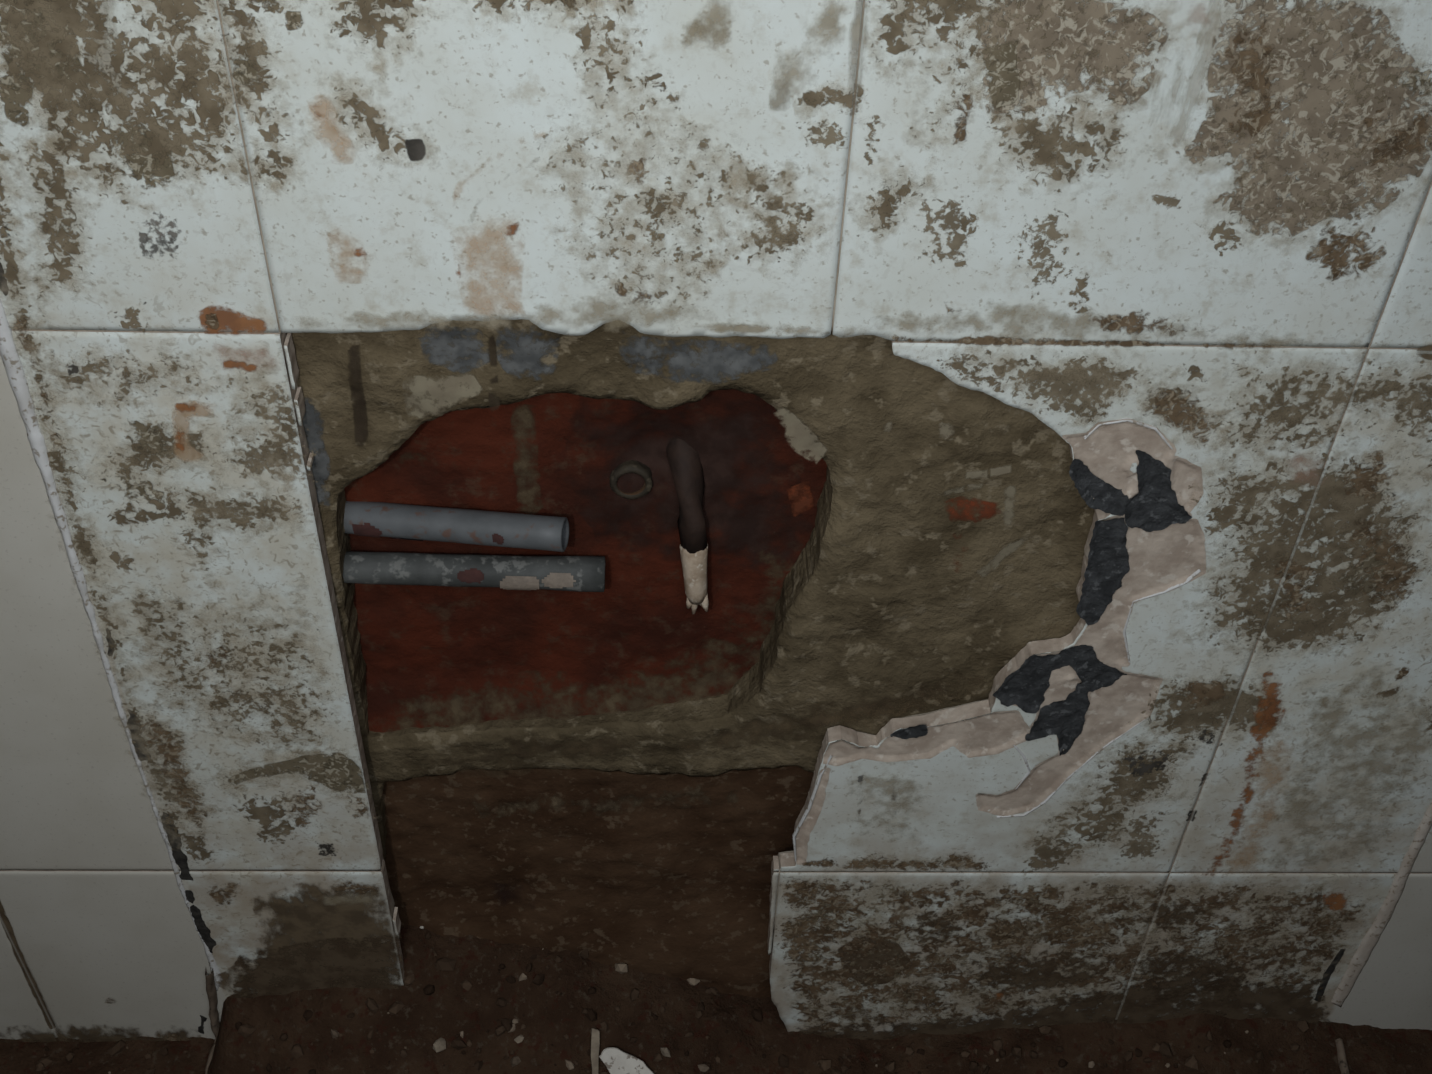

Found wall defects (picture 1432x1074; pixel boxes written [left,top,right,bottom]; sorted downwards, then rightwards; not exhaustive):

leakage [0,0,375,861]
corrosion [199,306,266,335]
corrosion [223,351,264,372]
leakage [473,0,821,325]
leakage [857,166,976,267]
leakage [818,0,1180,192]
leakage [892,209,1432,656]
mould [1176,0,1432,281]
crack [0,901,55,1029]
spalling [286,319,1206,998]
leakage [775,674,1364,1033]
corrosion [1206,672,1285,875]